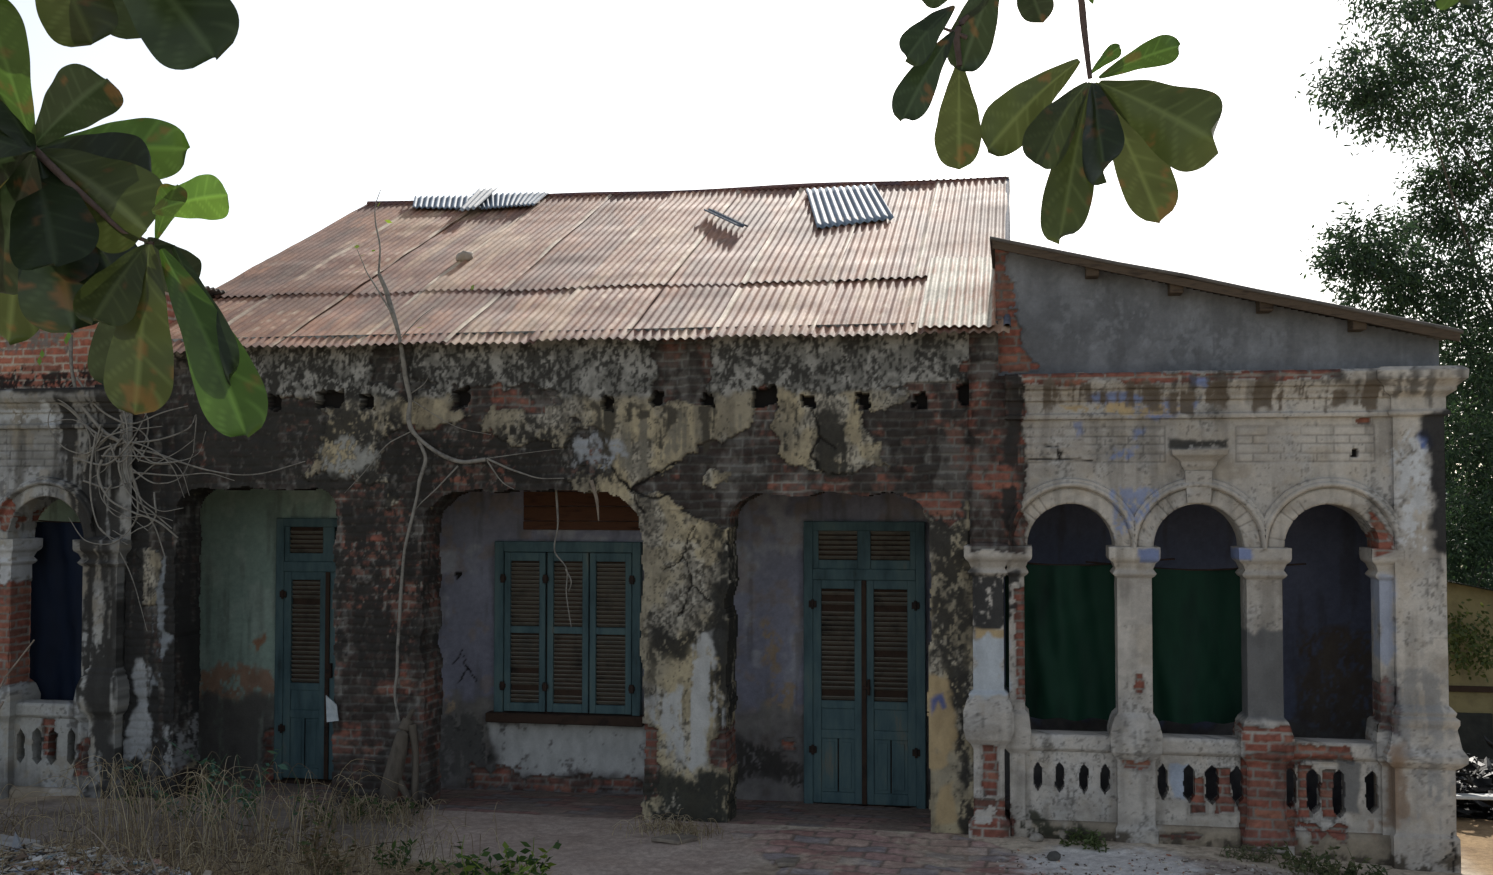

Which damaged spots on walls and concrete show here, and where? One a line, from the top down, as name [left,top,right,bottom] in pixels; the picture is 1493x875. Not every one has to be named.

flaking render [636,249,1191,553]
leakage [1019,270,1469,557]
flaking render [0,579,36,688]
leakage [0,362,274,799]
flaking render [122,342,596,809]
leakage [438,508,804,823]
flaking render [709,721,737,770]
flaking render [927,672,1016,838]
flaking render [975,588,1025,701]
flaking render [1160,721,1355,848]